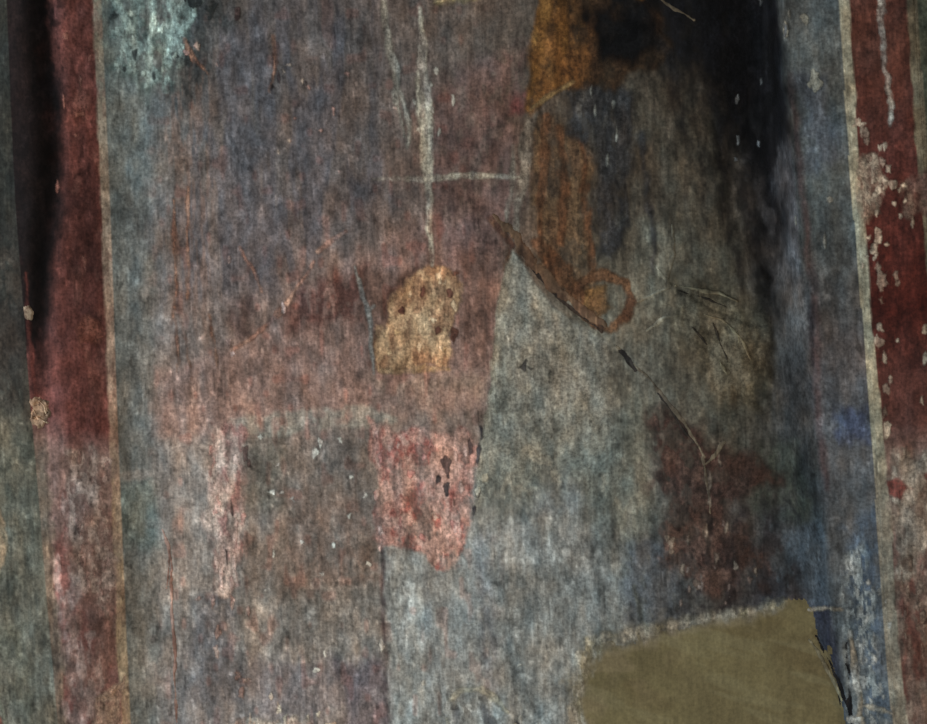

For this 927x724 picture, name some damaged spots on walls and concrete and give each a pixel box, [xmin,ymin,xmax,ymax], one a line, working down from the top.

peeling [853,118,927,303]
crack [487,214,726,514]
peeling [874,323,887,363]
peeling [883,408,891,439]
crack [815,635,853,724]